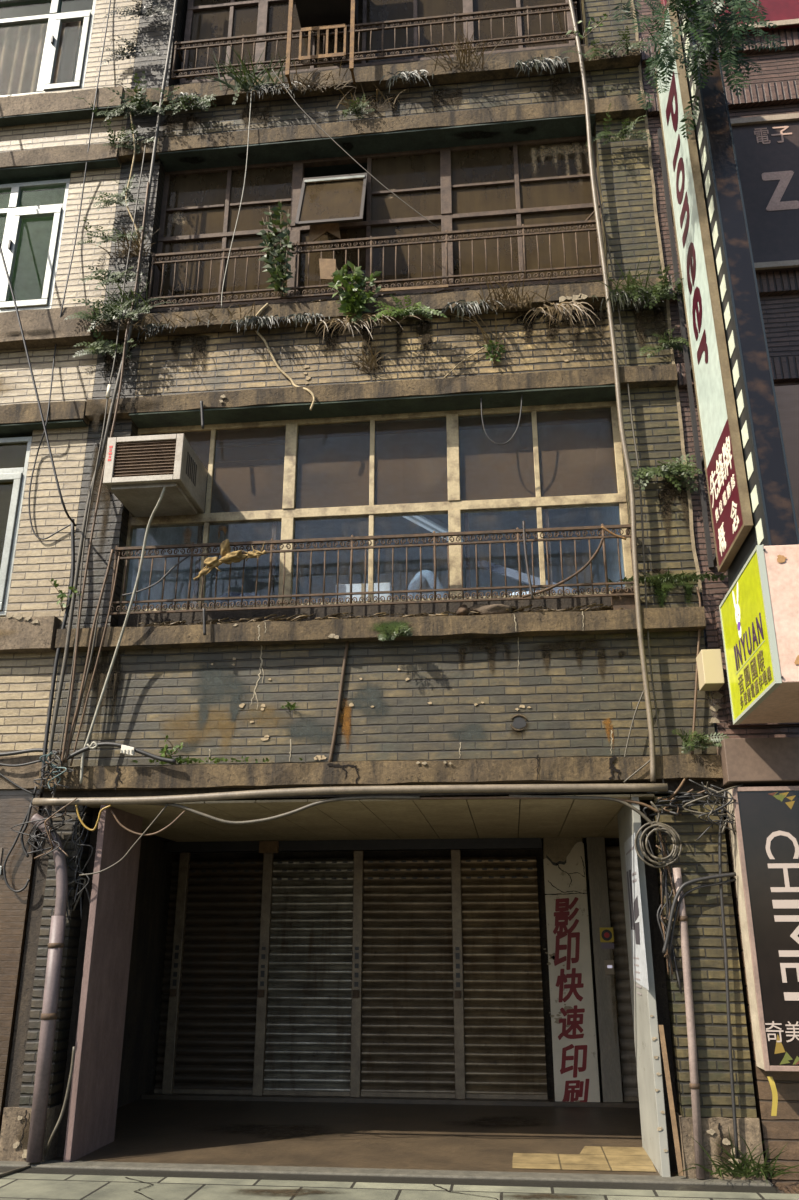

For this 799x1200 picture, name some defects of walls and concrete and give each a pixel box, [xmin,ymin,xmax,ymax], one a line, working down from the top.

damp [532,145,589,171]
damp [459,638,510,671]
damp [182,668,245,762]
rust [339,703,350,737]